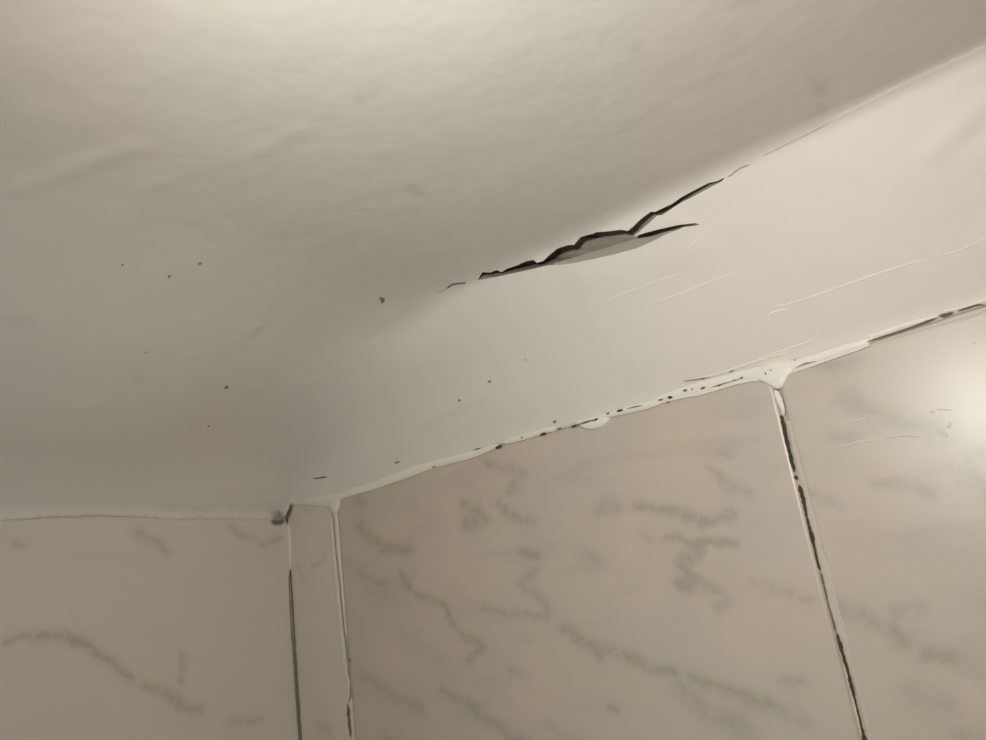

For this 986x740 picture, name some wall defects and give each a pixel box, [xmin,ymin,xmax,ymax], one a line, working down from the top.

crack [446,165,748,289]